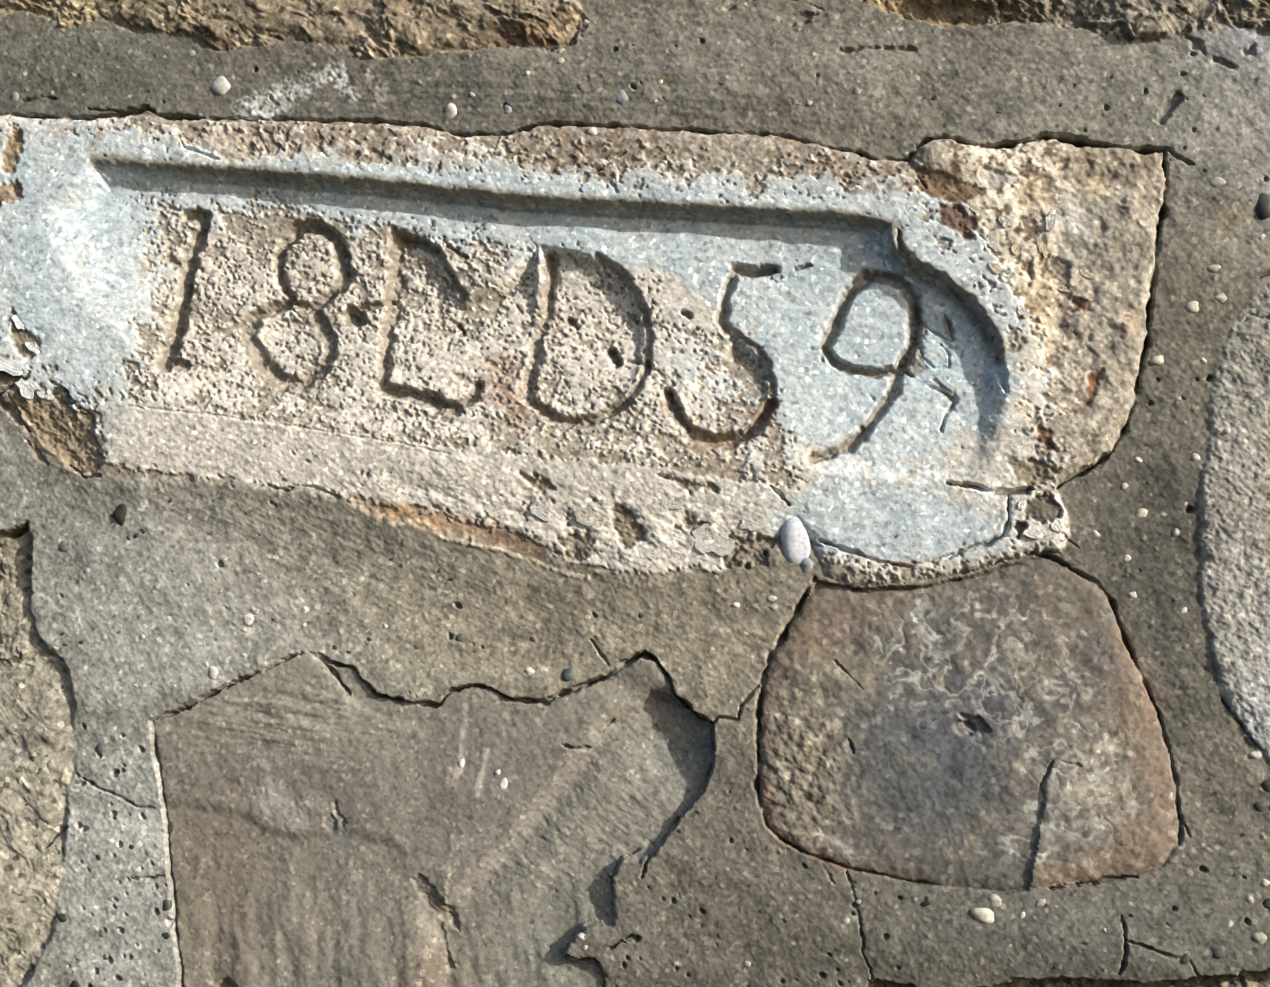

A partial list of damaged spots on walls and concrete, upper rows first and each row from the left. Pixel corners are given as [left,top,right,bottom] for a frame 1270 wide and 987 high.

spalling [0,309,105,475]
crack [0,94,1196,851]
crack [82,576,943,987]
crack [1048,874,1142,893]
crack [1116,913,1201,977]